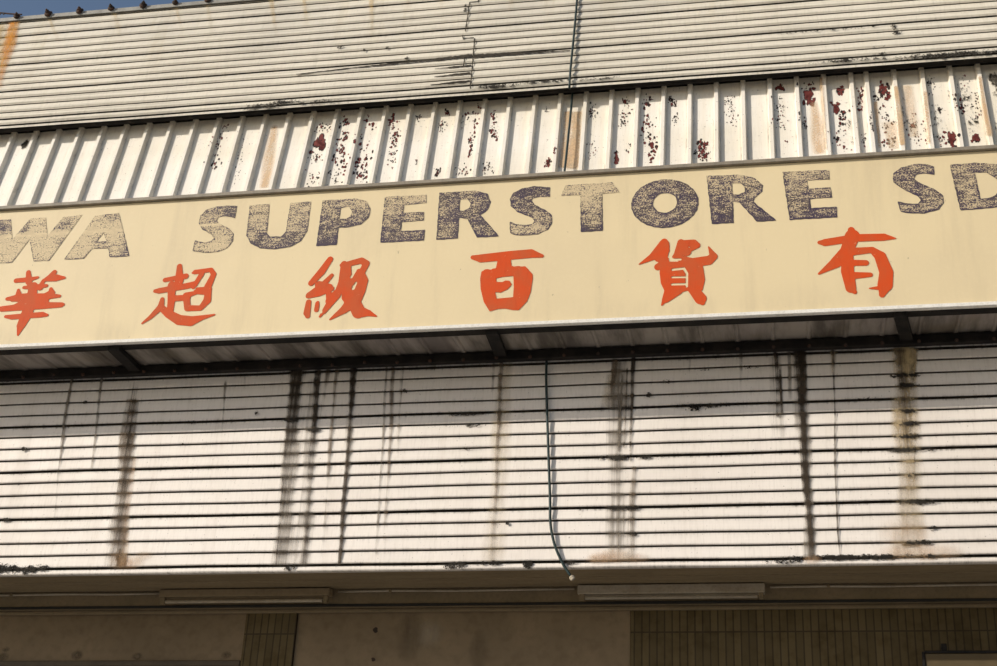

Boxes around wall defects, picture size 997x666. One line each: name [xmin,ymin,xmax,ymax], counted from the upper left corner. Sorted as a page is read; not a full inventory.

corrosion [0,22,17,70]
corrosion [874,86,905,145]
damp [110,390,137,557]
damp [274,368,357,571]
damp [600,357,662,549]
damp [674,403,730,411]
damp [754,347,939,564]